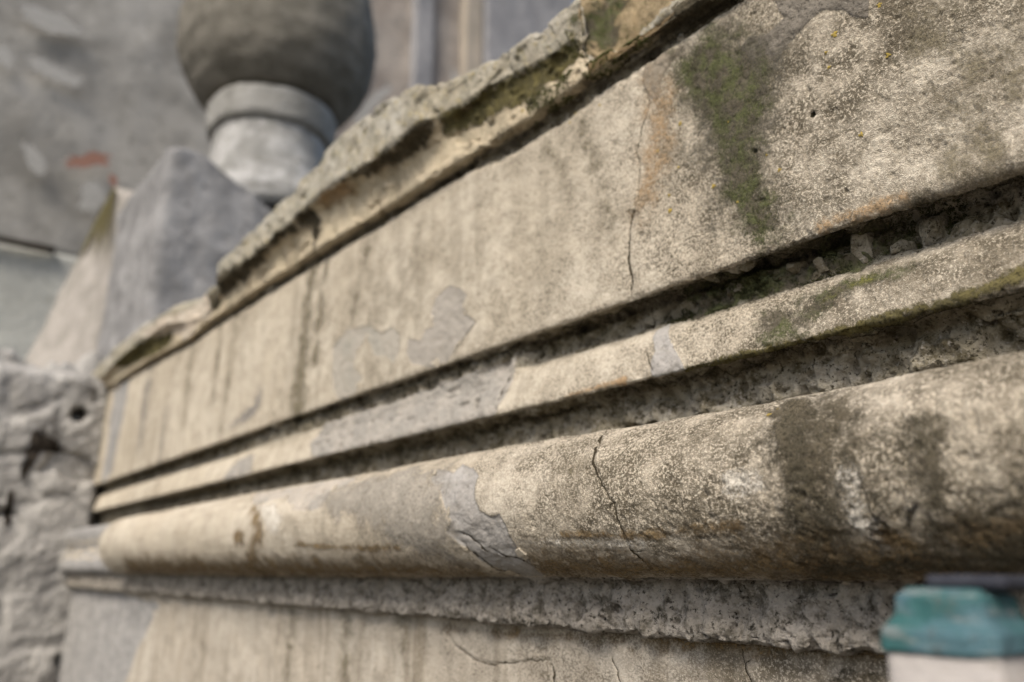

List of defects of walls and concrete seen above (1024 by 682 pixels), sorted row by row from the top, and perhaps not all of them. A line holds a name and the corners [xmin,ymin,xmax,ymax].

water stain [906,4,1024,181]
water stain [131,0,945,479]
crack [627,91,650,295]
peeling [332,286,476,400]
water stain [145,262,1024,509]
spalling [431,464,544,576]
crack [592,431,648,566]
water stain [530,389,1024,582]